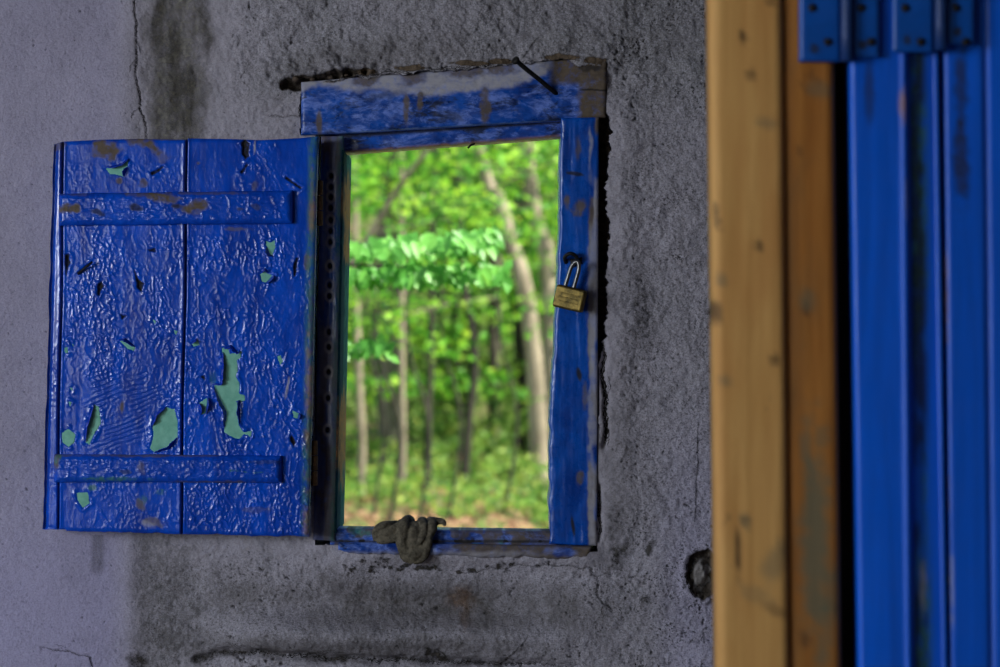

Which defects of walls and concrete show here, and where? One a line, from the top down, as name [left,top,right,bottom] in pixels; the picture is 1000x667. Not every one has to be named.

crack [129,0,148,137]
water stain [151,0,204,140]
flaking render [279,58,529,92]
peeling [106,158,129,177]
peeling [265,240,275,257]
peeling [199,345,252,439]
peeling [62,404,101,447]
peeling [150,407,178,453]
peeling [77,492,90,508]
flaking render [685,549,713,600]